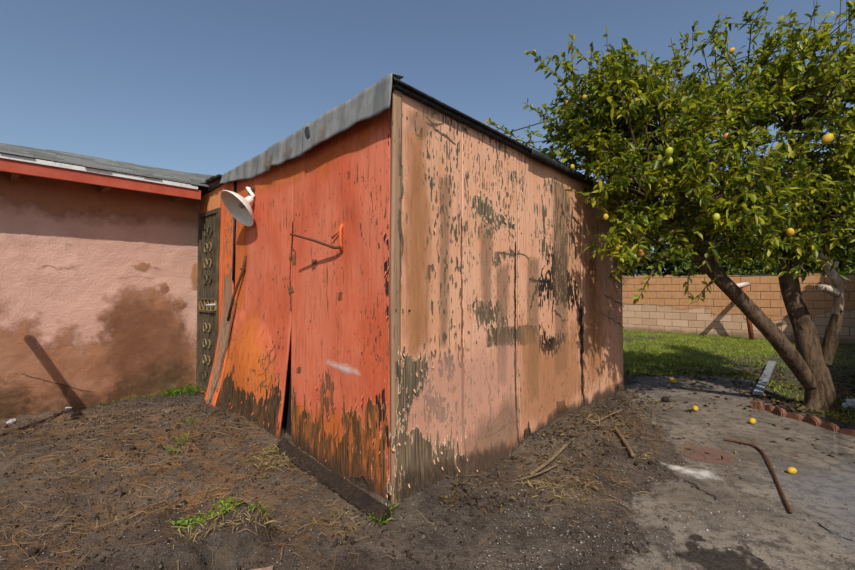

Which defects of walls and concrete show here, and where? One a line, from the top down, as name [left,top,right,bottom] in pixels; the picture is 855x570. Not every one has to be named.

damp [0,283,197,420]
peeling [208,209,284,405]
peeling [309,369,336,422]
damp [215,317,626,504]
peeling [344,107,621,483]